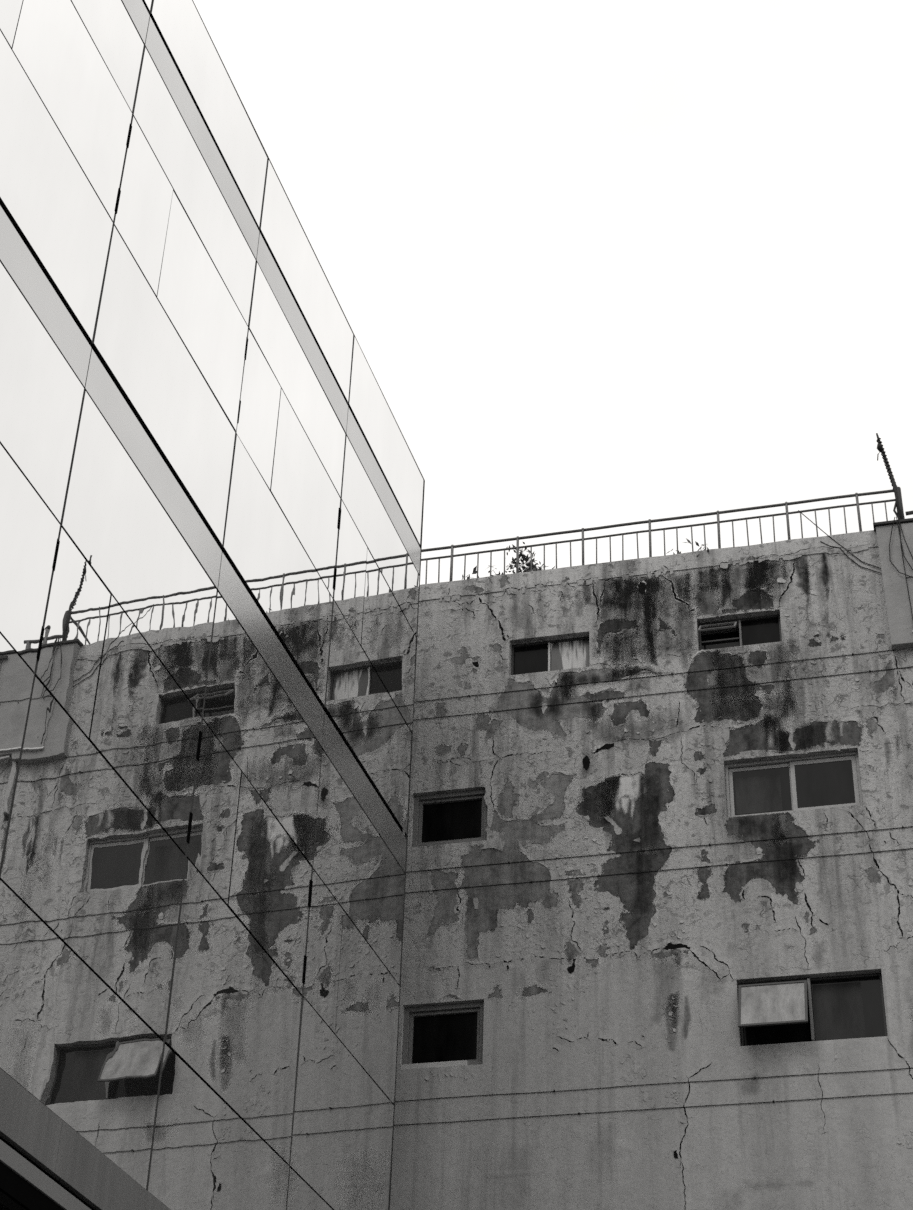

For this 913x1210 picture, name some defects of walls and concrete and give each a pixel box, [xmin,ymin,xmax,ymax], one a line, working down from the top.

leakage [533,559,774,714]
leakage [793,553,829,593]
peeling [424,617,694,974]
leakage [613,774,658,844]
crack [820,804,913,965]
crack [673,1059,716,1210]
crack [882,1037,913,1110]